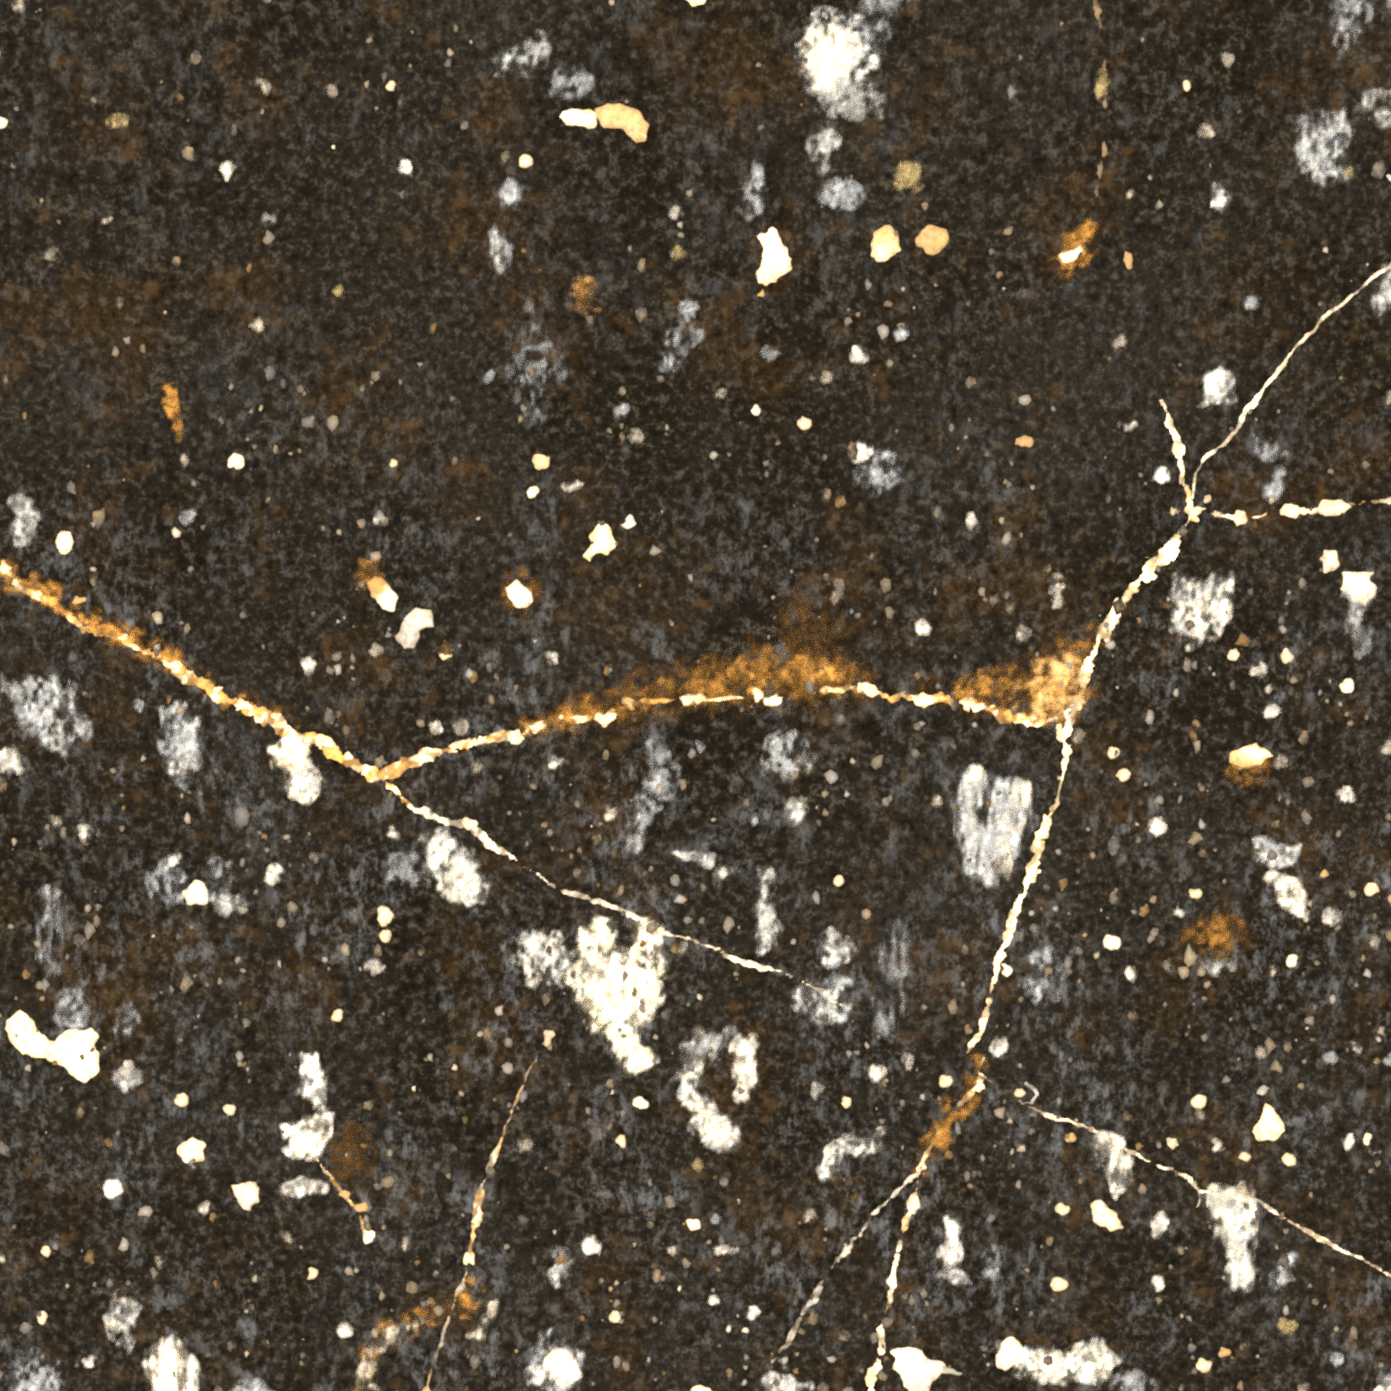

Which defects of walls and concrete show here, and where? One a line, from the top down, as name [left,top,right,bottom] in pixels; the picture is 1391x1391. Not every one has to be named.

crack [1092,0,1108,108]
crack [1094,142,1107,197]
crack [0,263,1391,1277]
rust [946,627,1093,723]
crack [422,1030,555,1391]
crack [769,1129,941,1391]